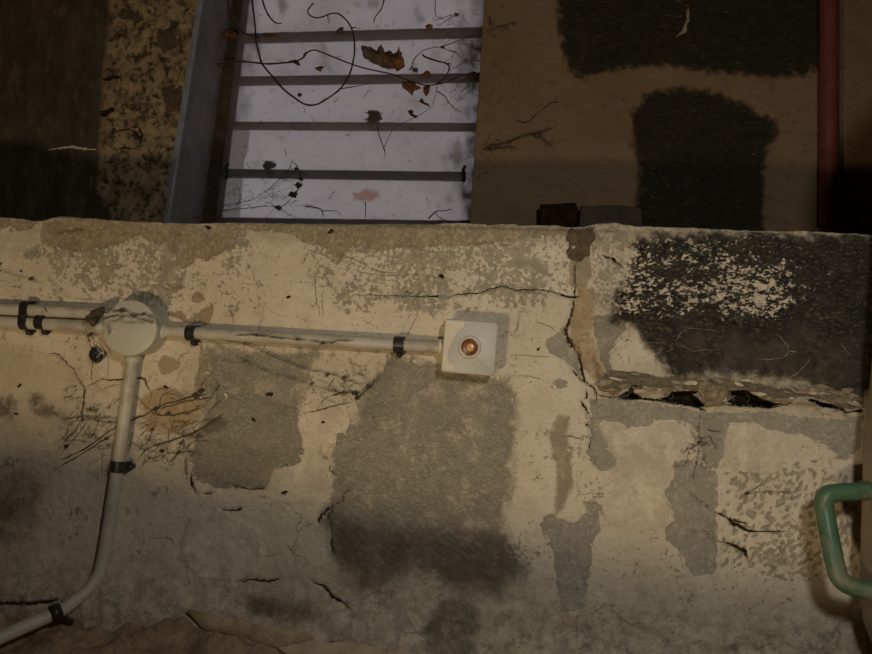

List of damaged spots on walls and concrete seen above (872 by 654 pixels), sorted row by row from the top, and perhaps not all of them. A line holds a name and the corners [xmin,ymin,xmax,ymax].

crack [0,598,57,606]
peeling [190,343,319,489]
peeling [322,356,517,583]
crack [307,249,705,458]
peeling [540,417,602,613]
peeling [585,314,865,576]
crack [687,487,788,557]
crack [727,385,799,408]